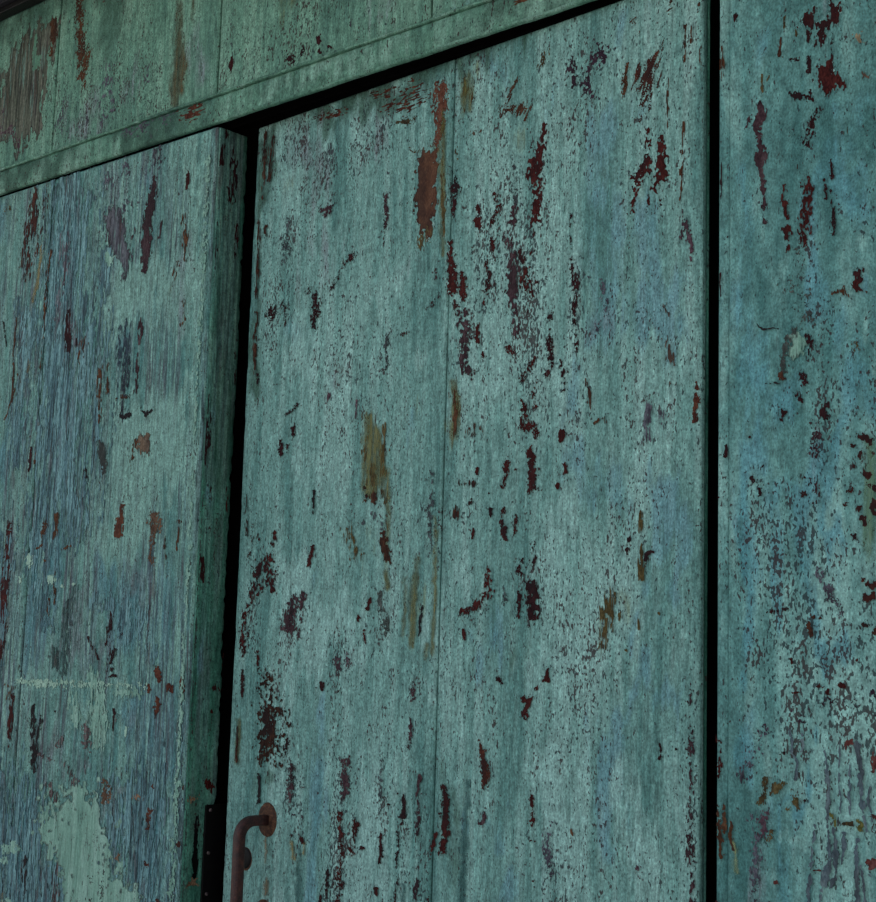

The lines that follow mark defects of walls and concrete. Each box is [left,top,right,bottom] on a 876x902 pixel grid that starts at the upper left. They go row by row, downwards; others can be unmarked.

peeling [0,14,125,161]
rust [429,79,449,147]
peeling [626,127,669,215]
peeling [744,100,768,225]
peeling [425,239,485,381]
peeling [777,159,836,381]
peeling [0,112,175,753]
peeling [793,371,809,403]
peeling [238,524,307,803]
peeling [816,682,876,717]
peeling [0,680,194,902]